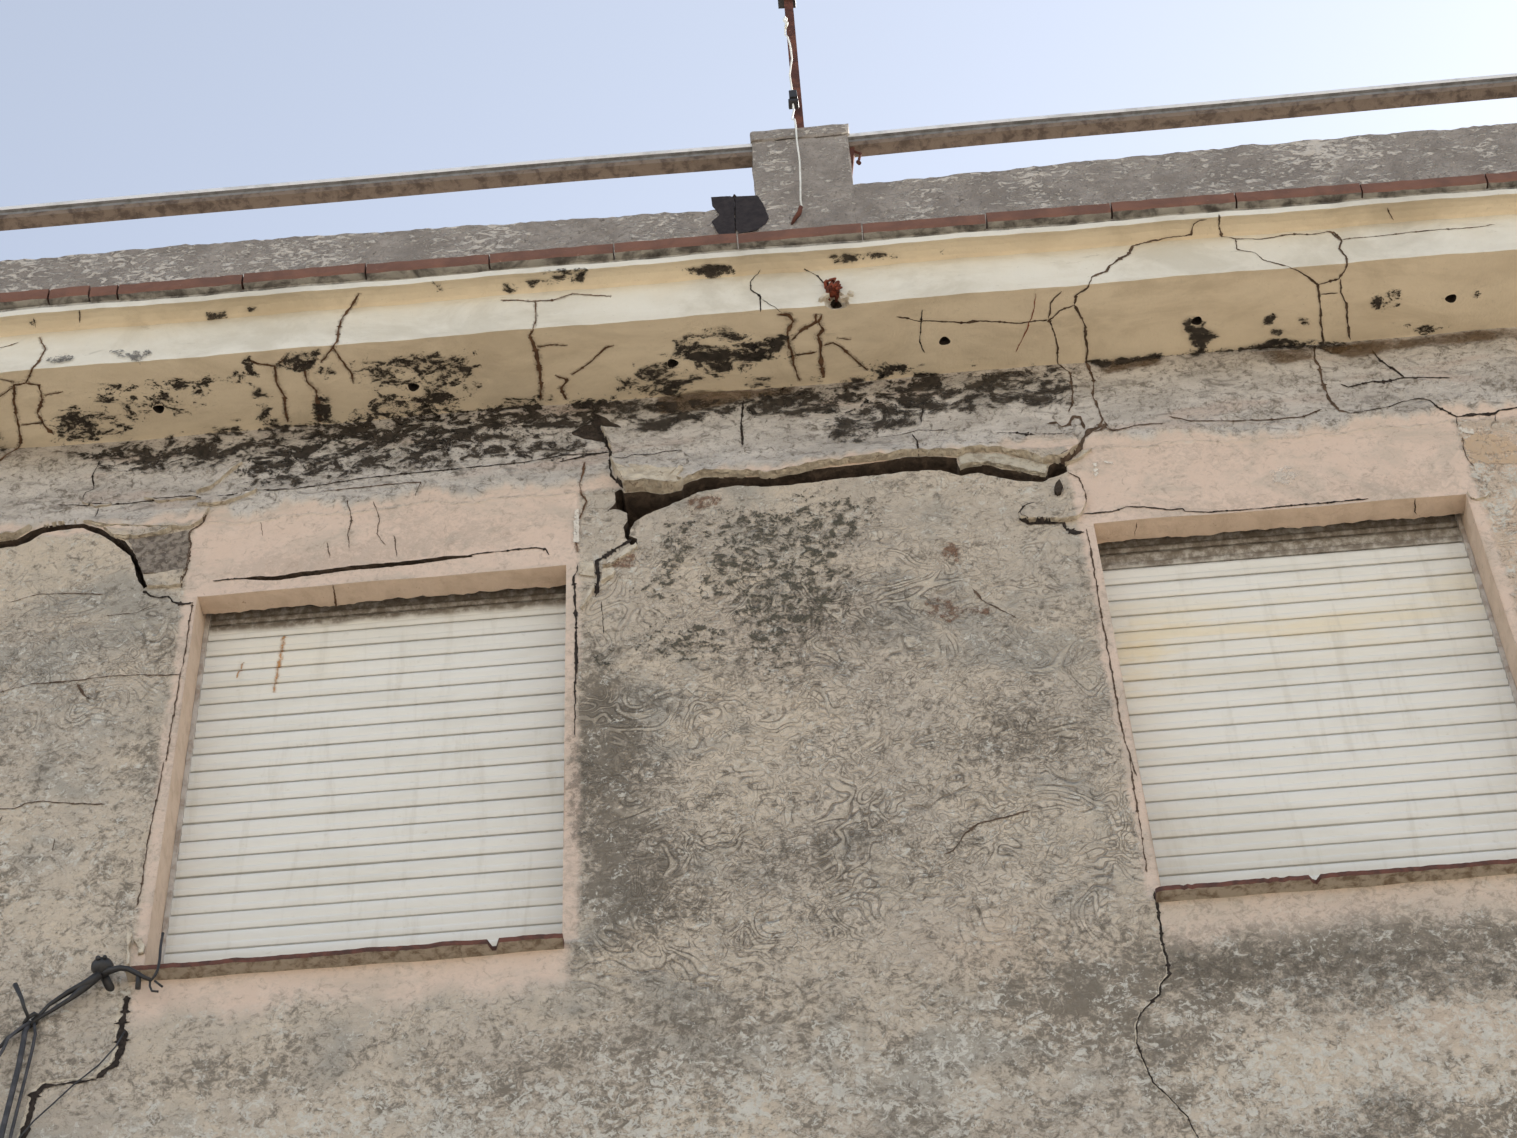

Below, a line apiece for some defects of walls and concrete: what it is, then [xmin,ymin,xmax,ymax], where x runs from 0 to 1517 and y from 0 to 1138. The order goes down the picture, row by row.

crack [730,194,738,233]
leakage [502,268,588,293]
leakage [682,264,736,278]
leakage [829,252,898,263]
leakage [1370,289,1401,310]
leakage [41,312,1514,490]
spalling [958,448,1113,496]
crack [0,208,1517,907]
crack [1134,891,1199,1138]
crack [17,996,131,1138]